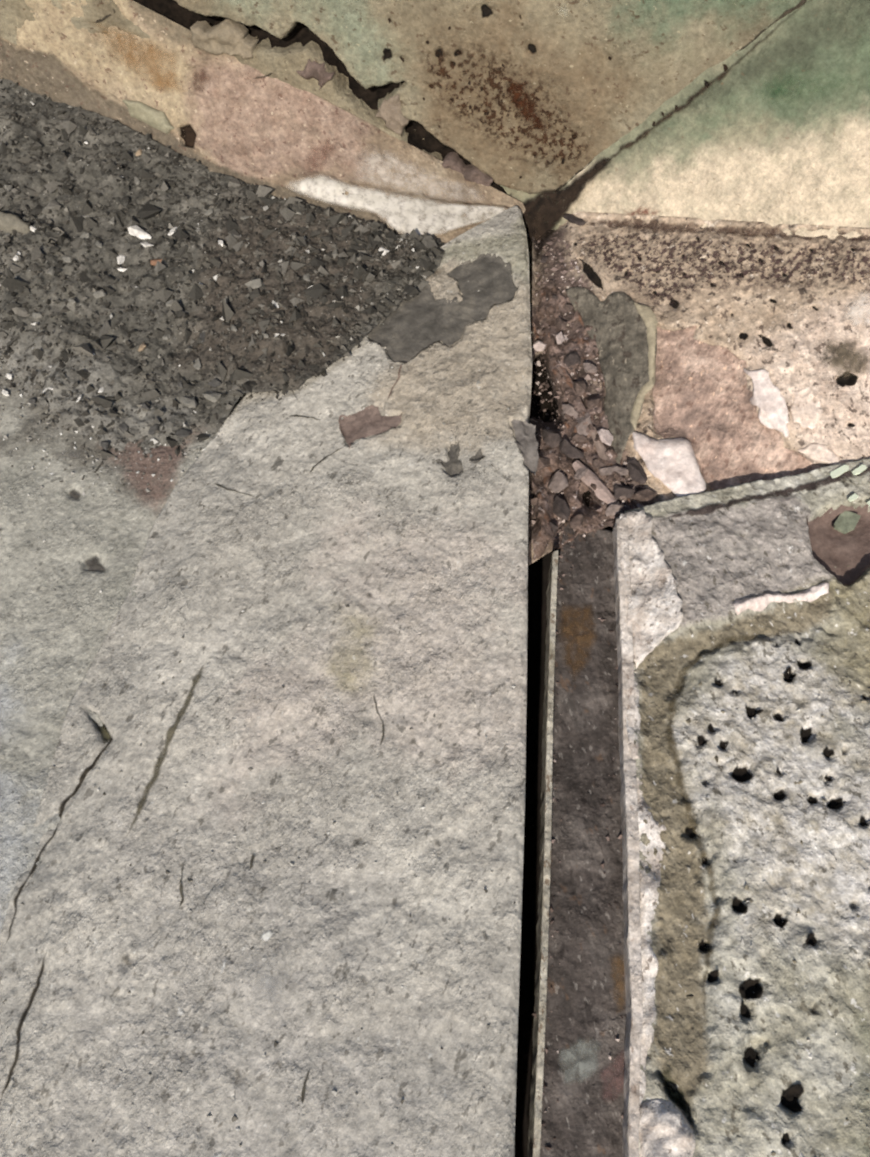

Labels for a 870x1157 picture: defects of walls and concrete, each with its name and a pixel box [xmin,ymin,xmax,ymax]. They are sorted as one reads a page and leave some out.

crack [95,0,471,165]
crack [491,181,510,196]
rust [427,54,586,166]
crack [557,0,806,190]
crack [132,666,203,825]
crack [8,720,112,939]
crack [3,963,44,1092]